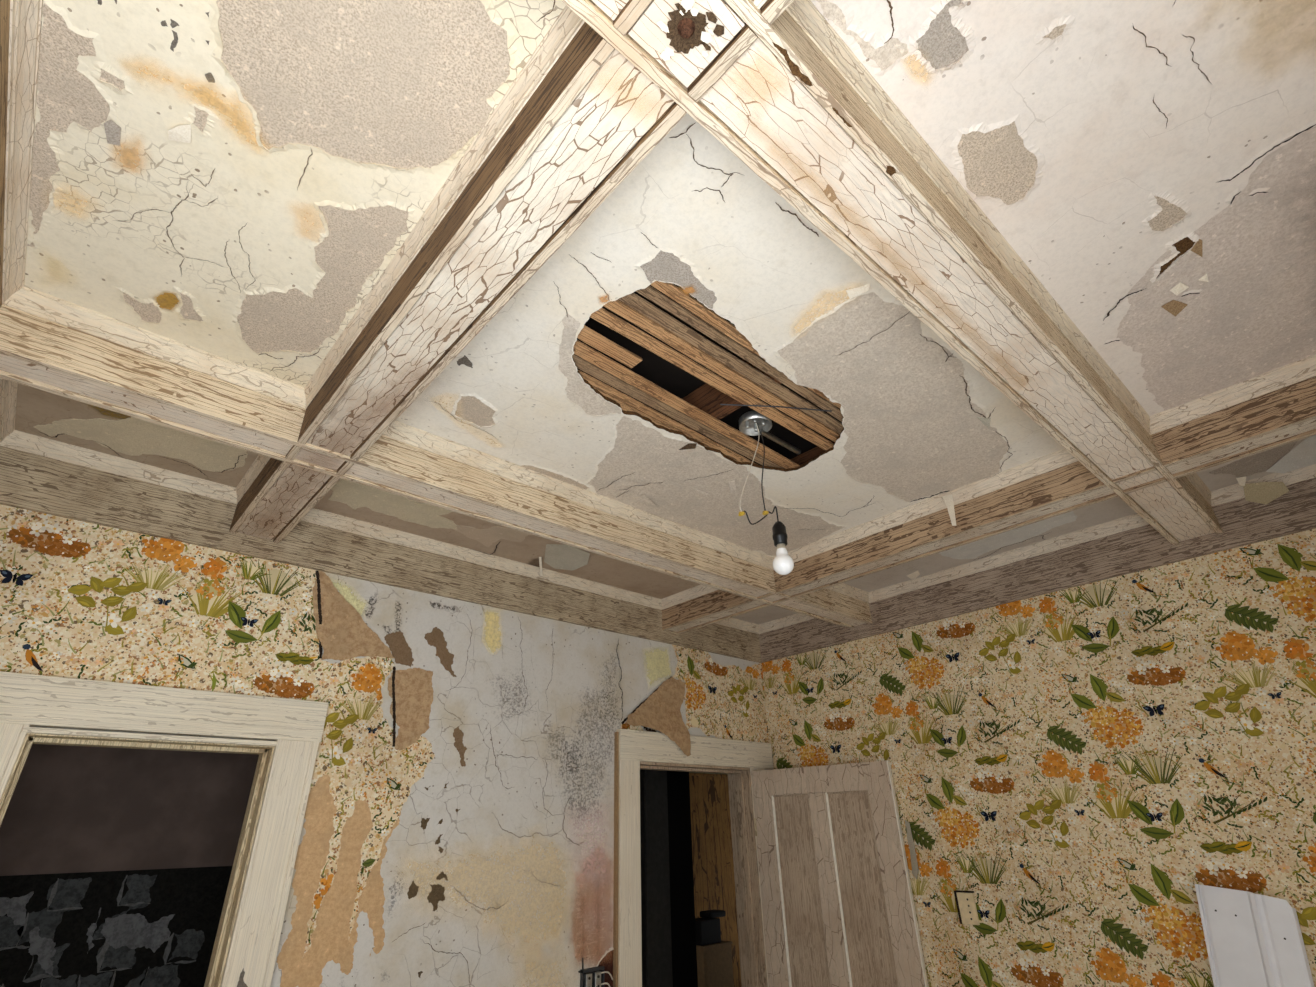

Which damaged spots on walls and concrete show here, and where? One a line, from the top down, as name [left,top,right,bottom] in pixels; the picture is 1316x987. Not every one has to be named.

peeling [27,0,134,250]
peeling [205,0,518,175]
crack [884,0,894,44]
crack [1132,0,1211,83]
crack [115,169,256,293]
peeling [231,200,415,356]
crack [572,253,611,300]
peeling [1117,126,1316,411]
peeling [521,309,848,557]
peeling [772,284,1013,526]
crack [490,727,584,845]
crack [394,923,470,983]